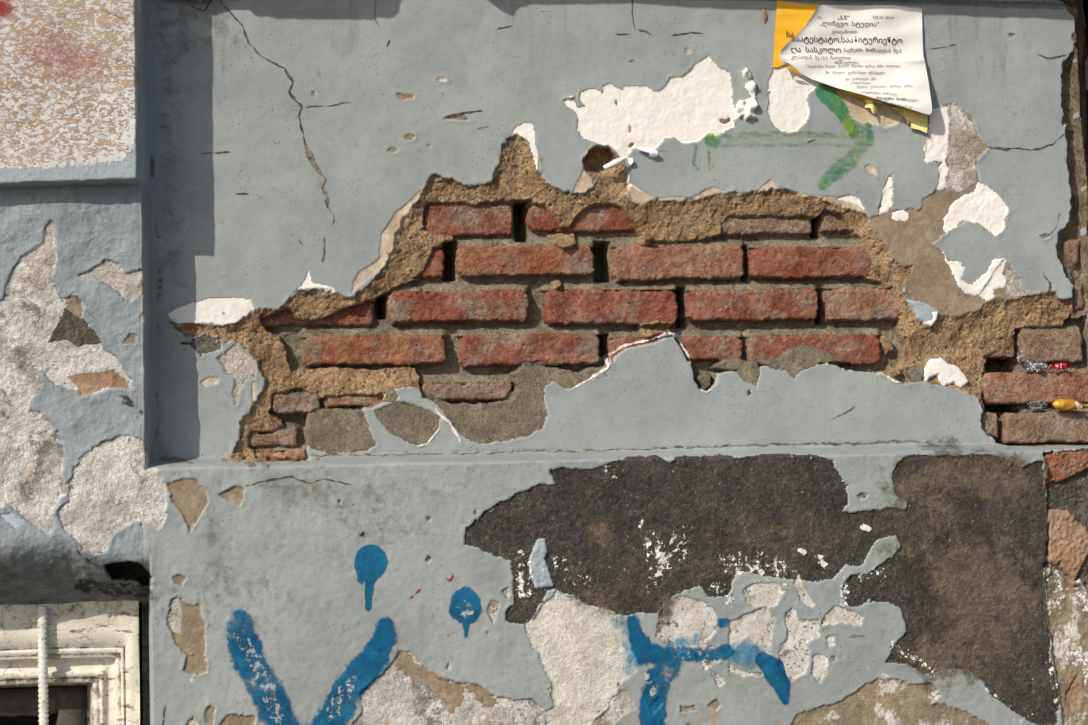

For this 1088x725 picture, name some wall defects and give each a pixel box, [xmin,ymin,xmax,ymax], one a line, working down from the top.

crack [187,0,349,261]
spalling [1057,0,1078,20]
peeling [0,220,244,555]
spalling [167,57,1088,725]